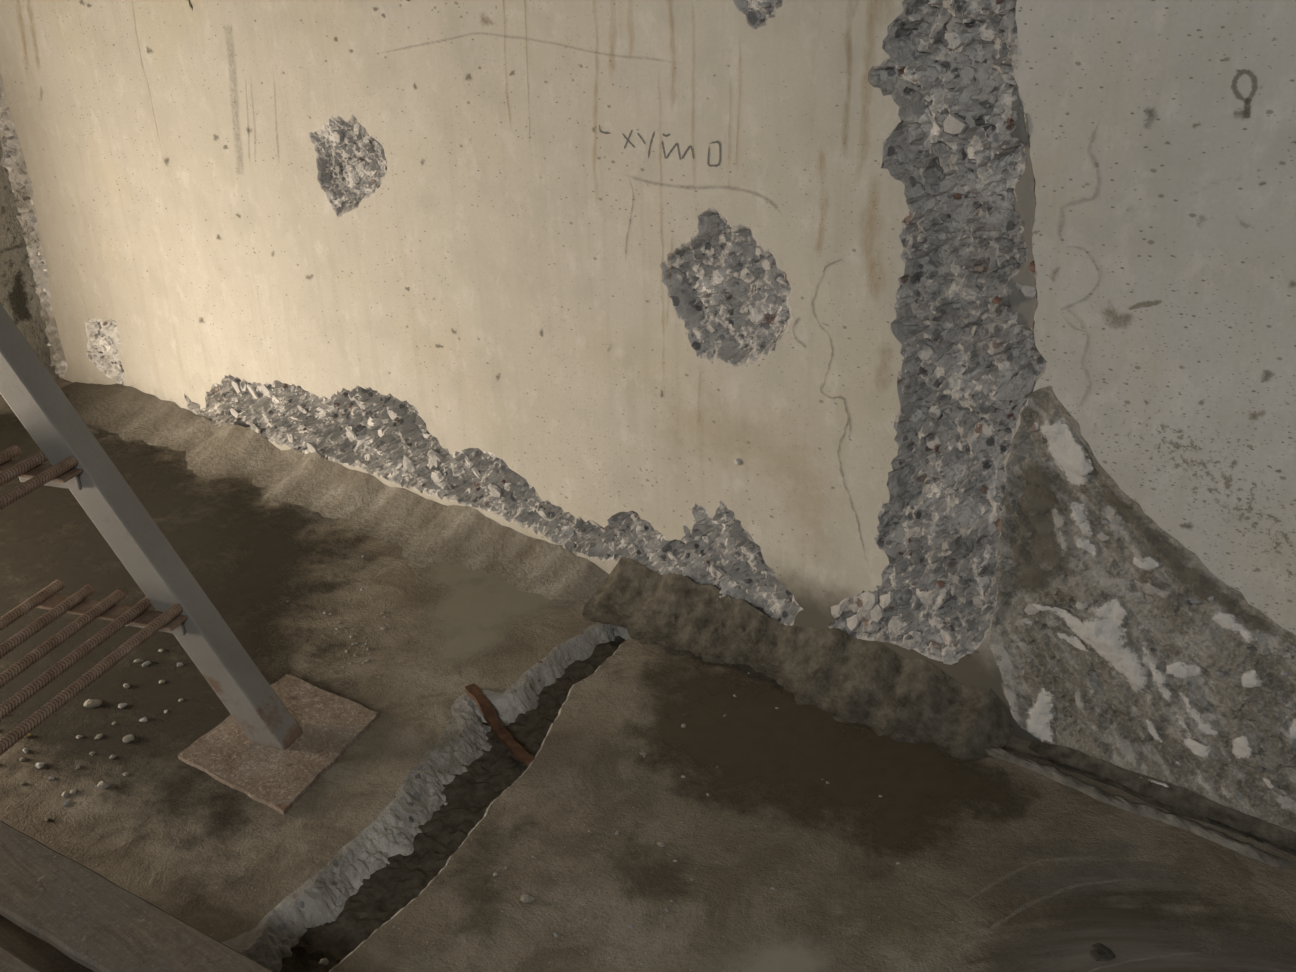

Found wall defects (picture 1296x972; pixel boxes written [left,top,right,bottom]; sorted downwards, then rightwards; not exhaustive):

spalling [733,0,783,30]
peeling [944,21,998,50]
spalling [308,115,388,219]
spalling [660,208,793,367]
peeling [1015,261,1037,298]
peeling [916,405,943,450]
spalling [184,374,804,626]
peeling [831,591,963,665]
spalling [972,385,1296,832]
corrosion [465,683,535,766]
leakage [628,650,1028,854]